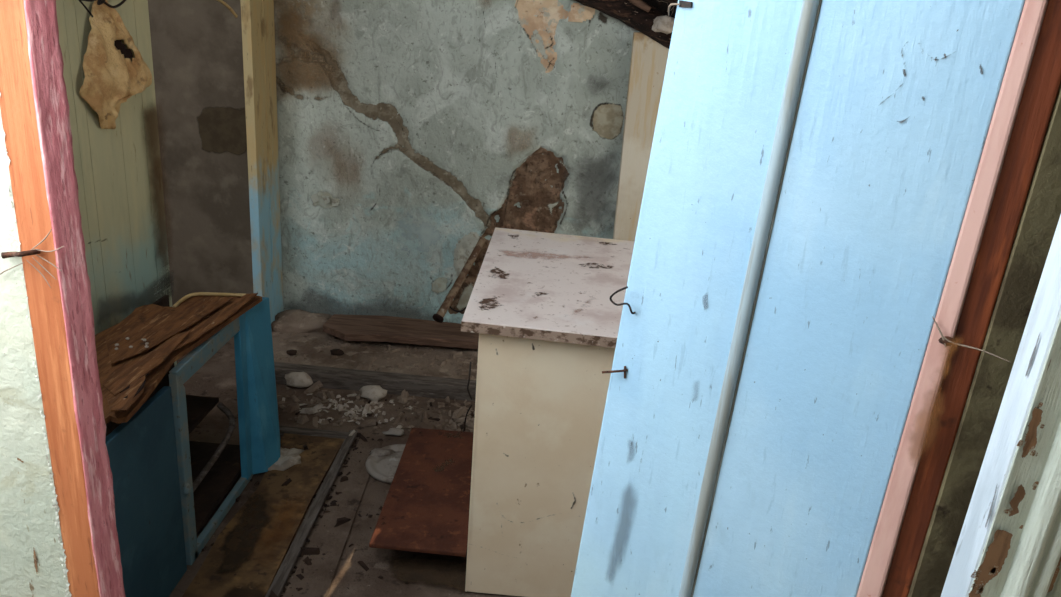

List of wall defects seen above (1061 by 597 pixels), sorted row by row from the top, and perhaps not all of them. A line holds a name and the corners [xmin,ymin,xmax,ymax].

flaking render [515,0,607,73]
crack [276,36,490,228]
flaking render [446,147,569,314]
peeling [1017,402,1045,458]
peeling [969,481,1039,597]
peeling [1047,557,1061,593]